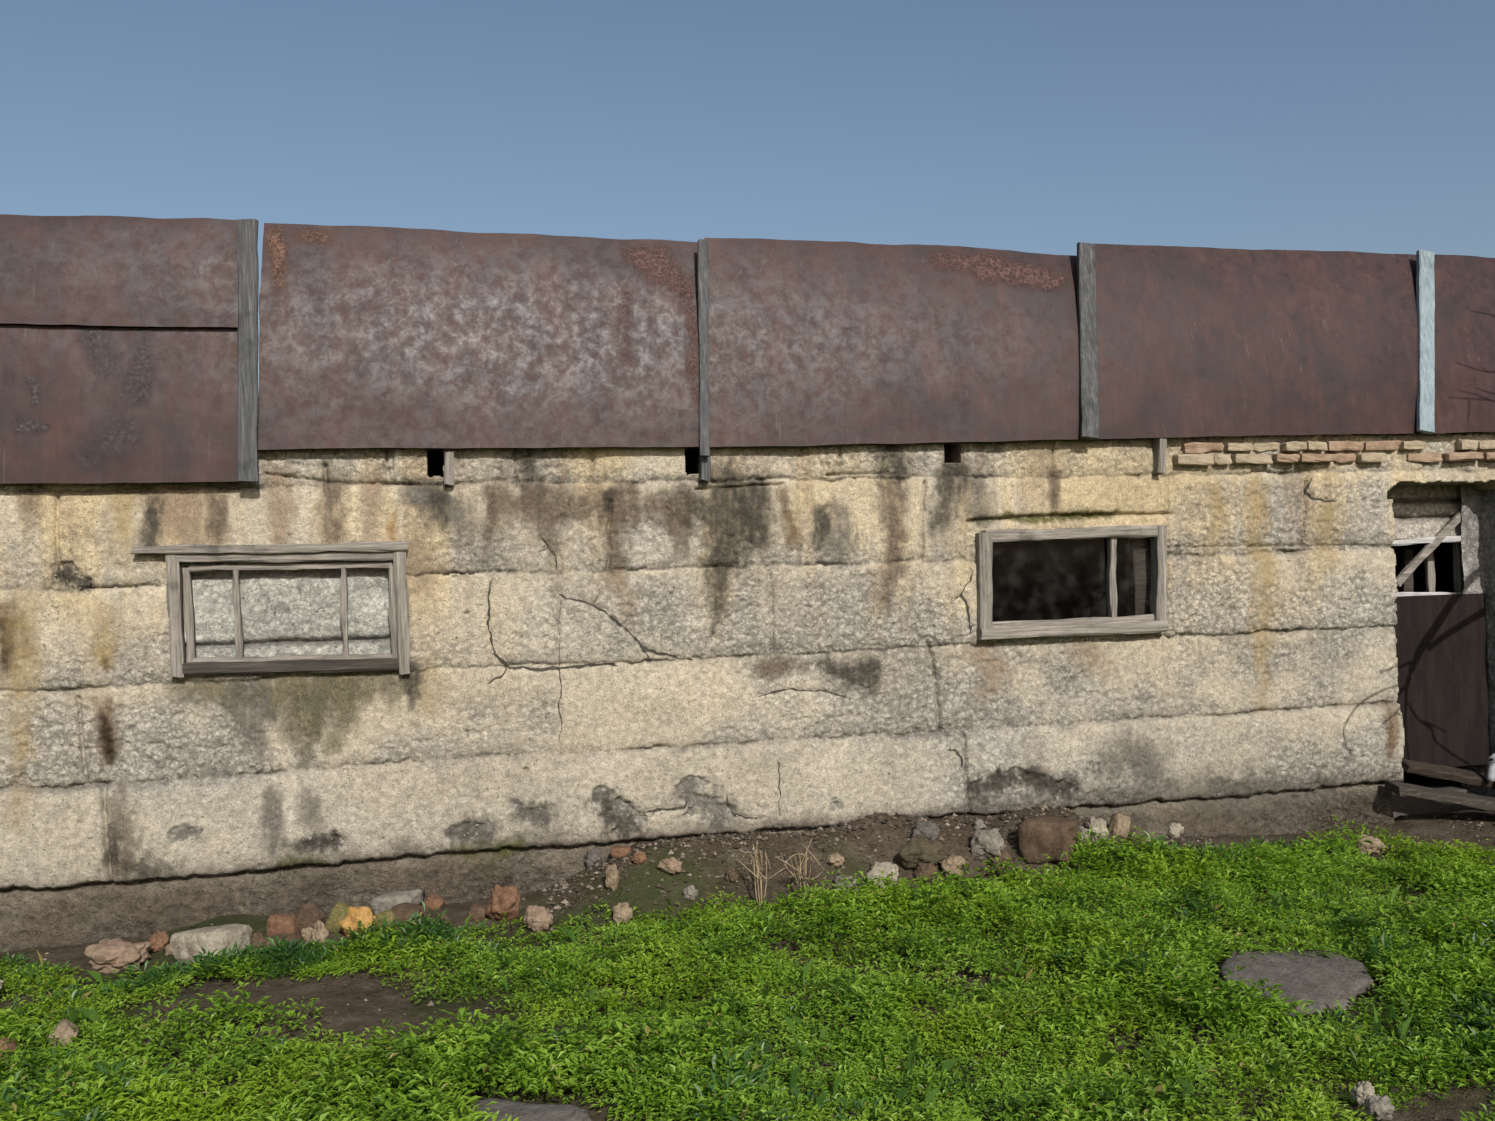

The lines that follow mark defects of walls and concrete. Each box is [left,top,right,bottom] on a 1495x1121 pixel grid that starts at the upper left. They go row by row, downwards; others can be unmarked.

rust [931,253,1065,290]
leakage [406,483,464,525]
leakage [485,448,770,621]
crack [486,537,693,741]
leakage [262,787,337,864]
leakage [1187,780,1316,809]